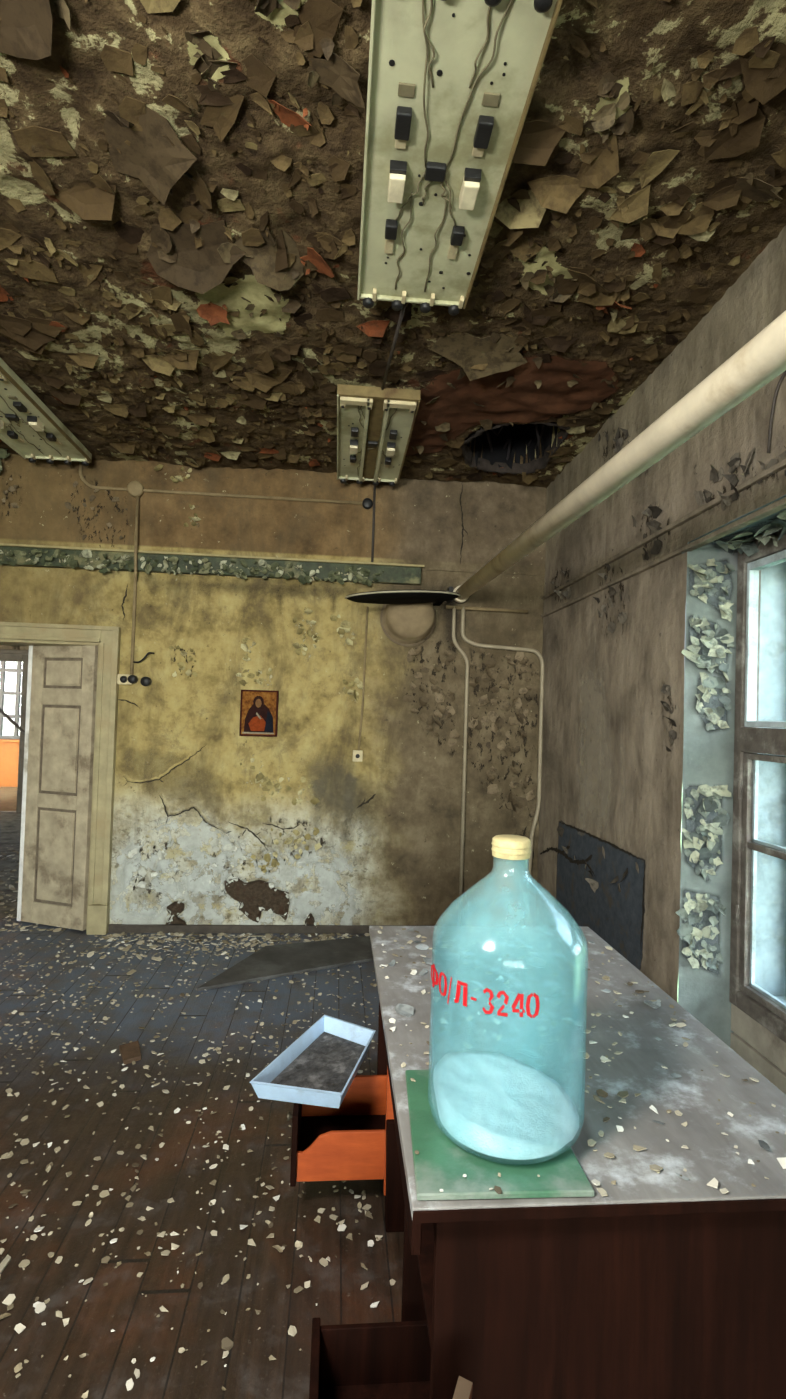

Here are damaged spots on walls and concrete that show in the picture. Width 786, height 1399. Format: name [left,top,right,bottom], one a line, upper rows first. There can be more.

peeling [0,0,786,485]
peeling [0,439,21,516]
peeling [694,446,786,511]
peeling [0,476,384,587]
peeling [631,504,671,560]
peeling [593,562,627,635]
crack [124,741,207,785]
flaking render [159,755,326,926]
crack [229,822,300,849]
peeling [128,842,186,925]
peeling [676,784,731,975]